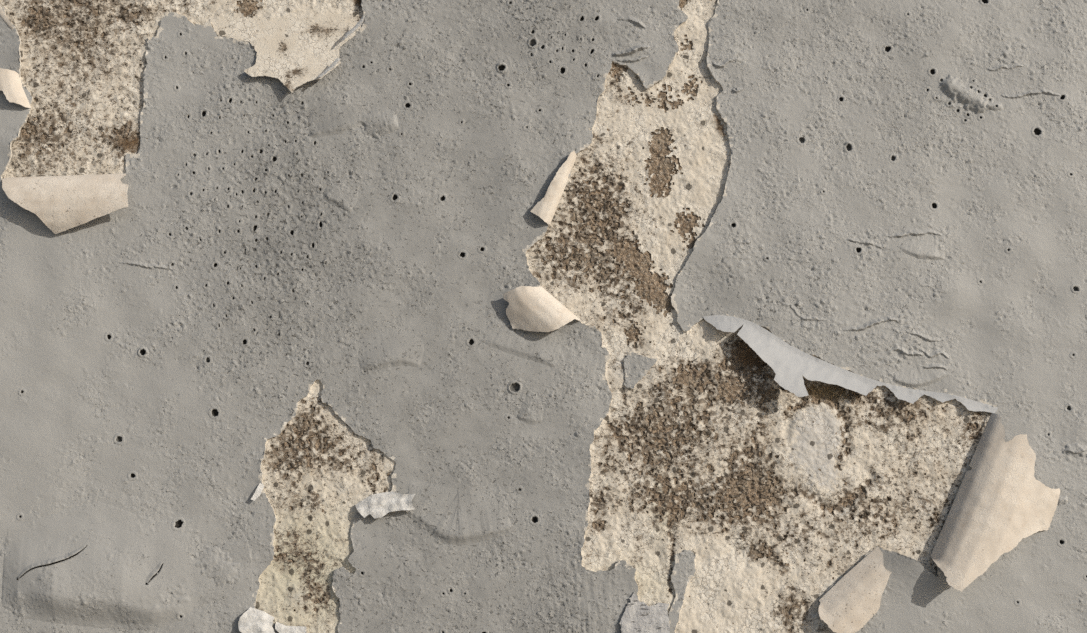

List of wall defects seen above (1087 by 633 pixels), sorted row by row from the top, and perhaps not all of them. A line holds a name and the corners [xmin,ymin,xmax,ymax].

peeling [0,0,365,234]
peeling [503,0,1060,633]
peeling [238,380,415,633]